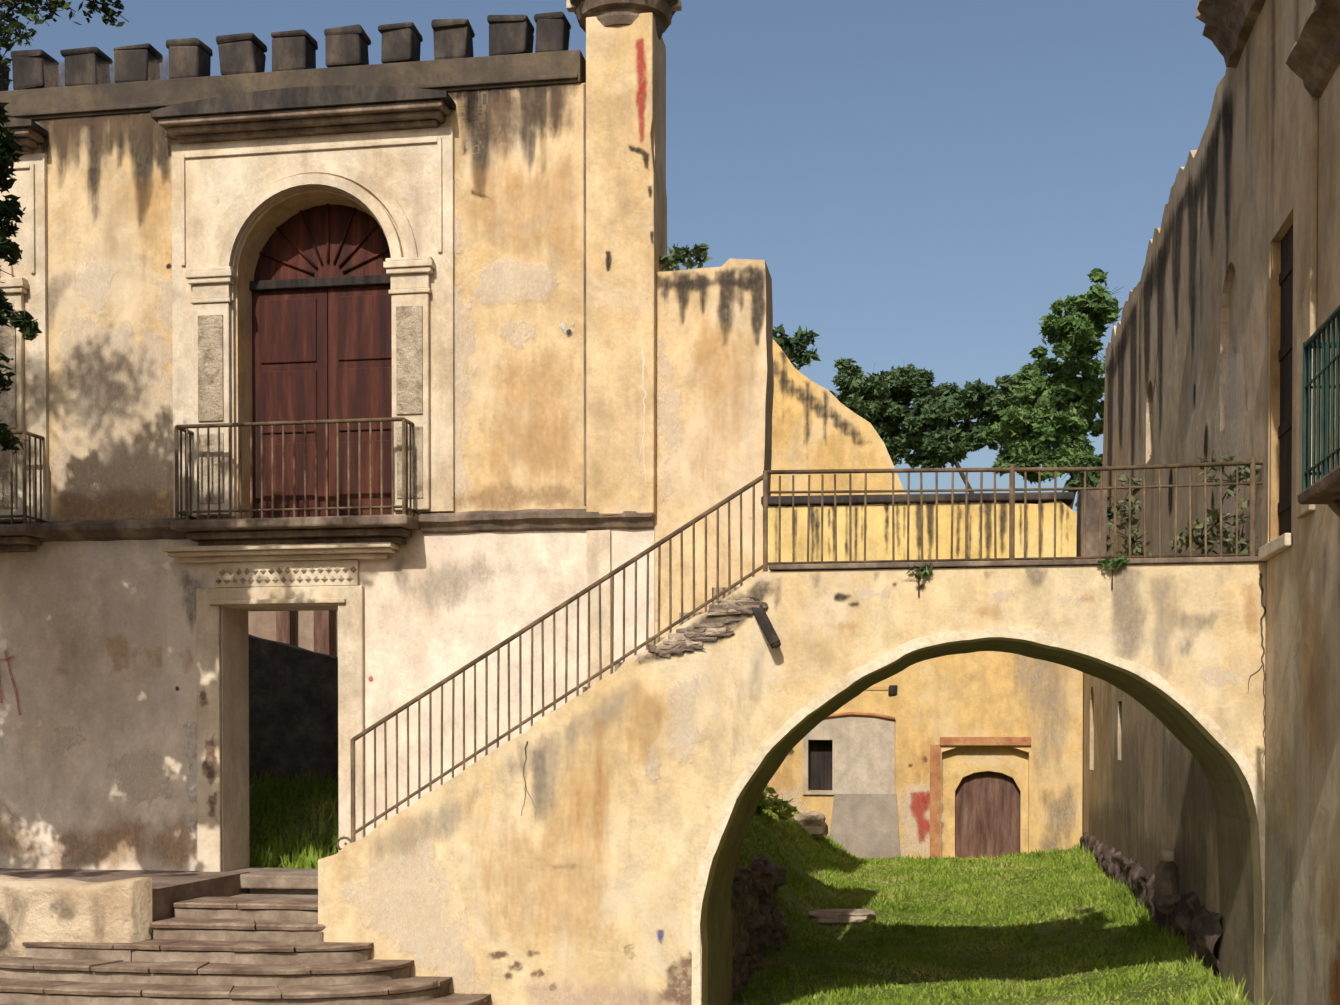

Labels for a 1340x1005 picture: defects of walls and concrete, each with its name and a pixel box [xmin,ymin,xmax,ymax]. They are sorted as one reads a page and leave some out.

water stain [39,112,170,222]
water stain [659,267,765,344]
water stain [1107,47,1248,532]
water stain [810,503,863,552]
water stain [885,502,950,560]
water stain [957,500,1043,559]
spalling [639,582,768,663]
crack [1248,573,1266,764]
flaking render [186,723,216,816]
crack [521,741,536,818]
water stain [55,825,197,864]
spalling [660,954,692,1005]